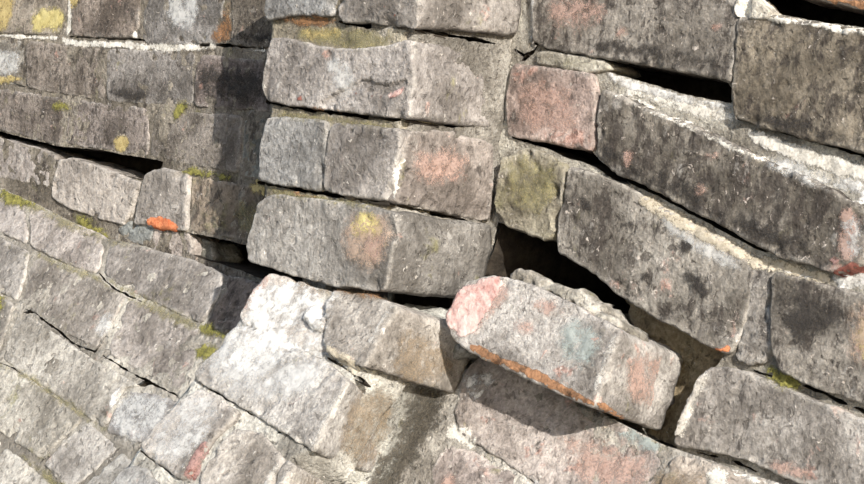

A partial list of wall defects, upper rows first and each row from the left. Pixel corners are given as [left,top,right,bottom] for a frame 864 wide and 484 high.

crack [100,274,145,303]
crack [26,310,178,396]